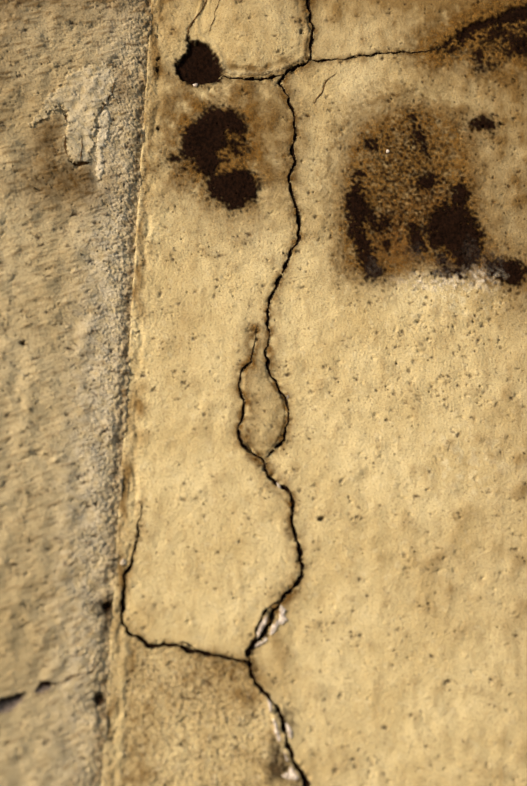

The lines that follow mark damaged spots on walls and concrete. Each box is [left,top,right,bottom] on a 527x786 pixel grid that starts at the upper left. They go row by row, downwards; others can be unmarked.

damp [162,81,284,214]
damp [328,94,527,294]
crack [120,0,438,786]
spalling [0,694,23,713]
spalling [35,681,52,693]